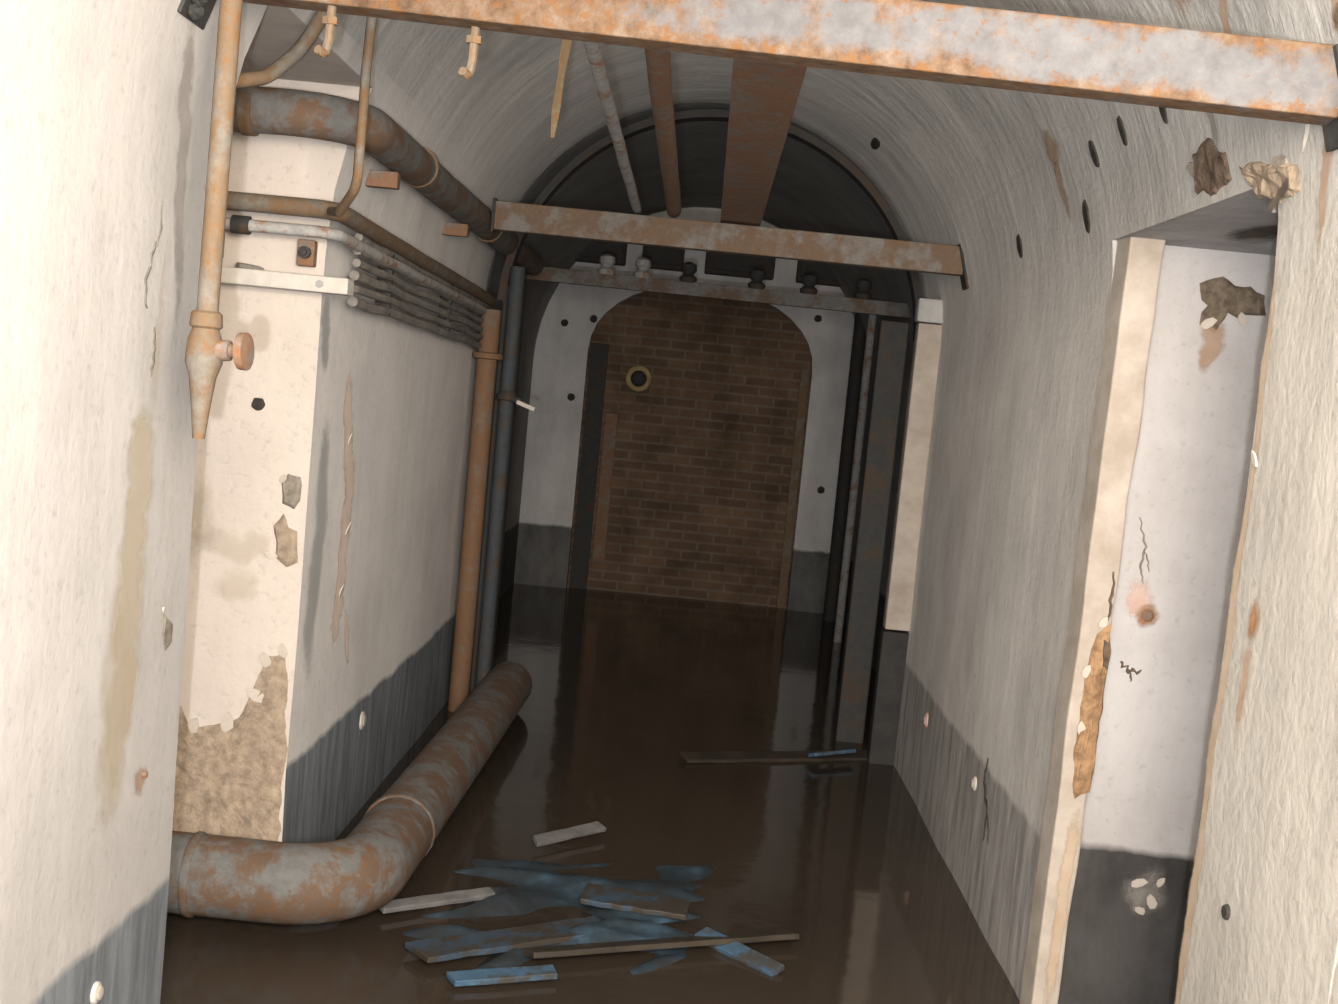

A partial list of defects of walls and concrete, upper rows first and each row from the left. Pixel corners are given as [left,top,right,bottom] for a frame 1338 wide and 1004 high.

corrosion [1045,135,1069,214]
spalling [1186,138,1301,212]
spalling [1199,276,1266,367]
spalling [264,474,302,567]
crack [1139,517,1150,584]
corrosion [1128,587,1156,625]
peeling [1072,572,1115,799]
spalling [172,643,289,841]
peeling [1046,824,1080,994]